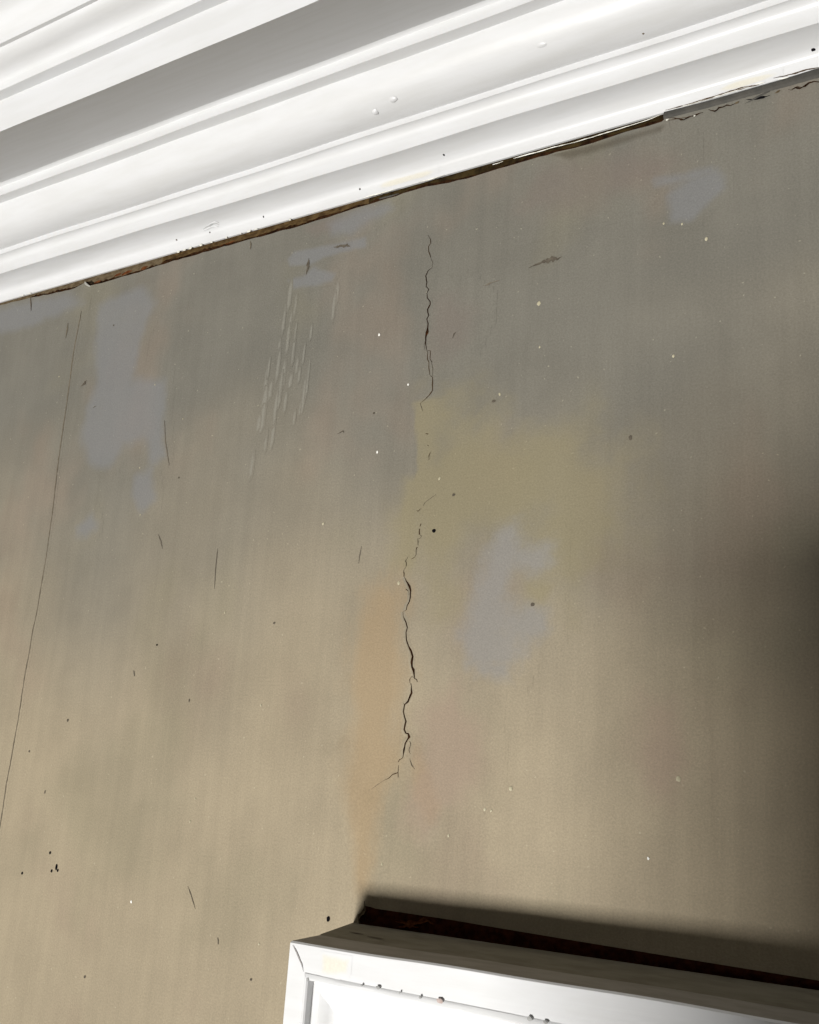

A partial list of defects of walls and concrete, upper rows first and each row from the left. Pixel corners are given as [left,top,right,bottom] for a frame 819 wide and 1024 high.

crack [421,239,433,455]
crack [373,495,435,788]